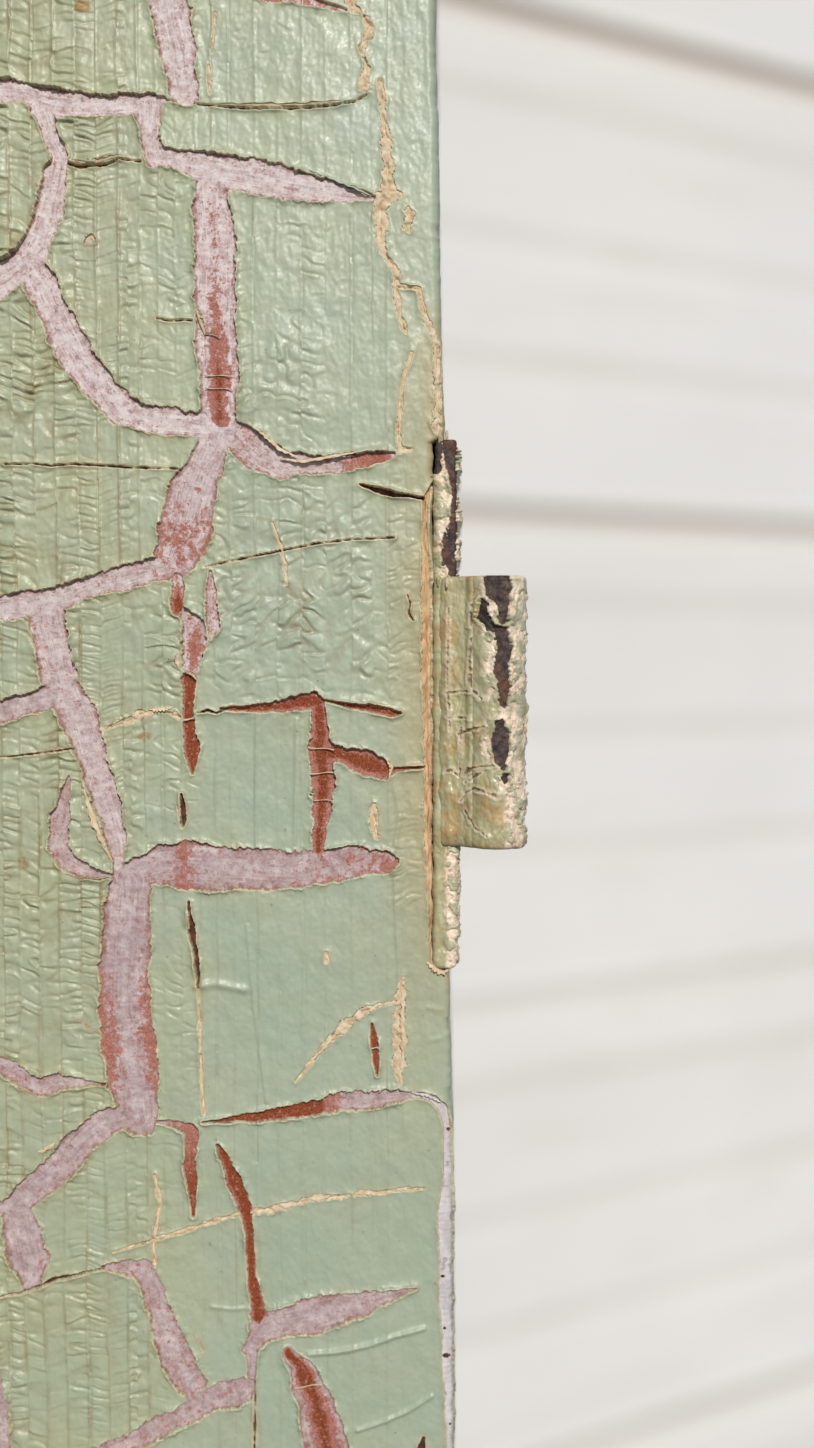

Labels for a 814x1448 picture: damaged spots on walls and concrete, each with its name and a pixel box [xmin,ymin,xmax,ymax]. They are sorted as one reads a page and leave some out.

peeling [345,0,449,454]
rust [435,439,458,577]
crack [0,0,441,1448]
peeling [369,803,380,840]
rust [476,575,513,784]
peeling [426,946,458,975]
peeling [391,976,454,1448]